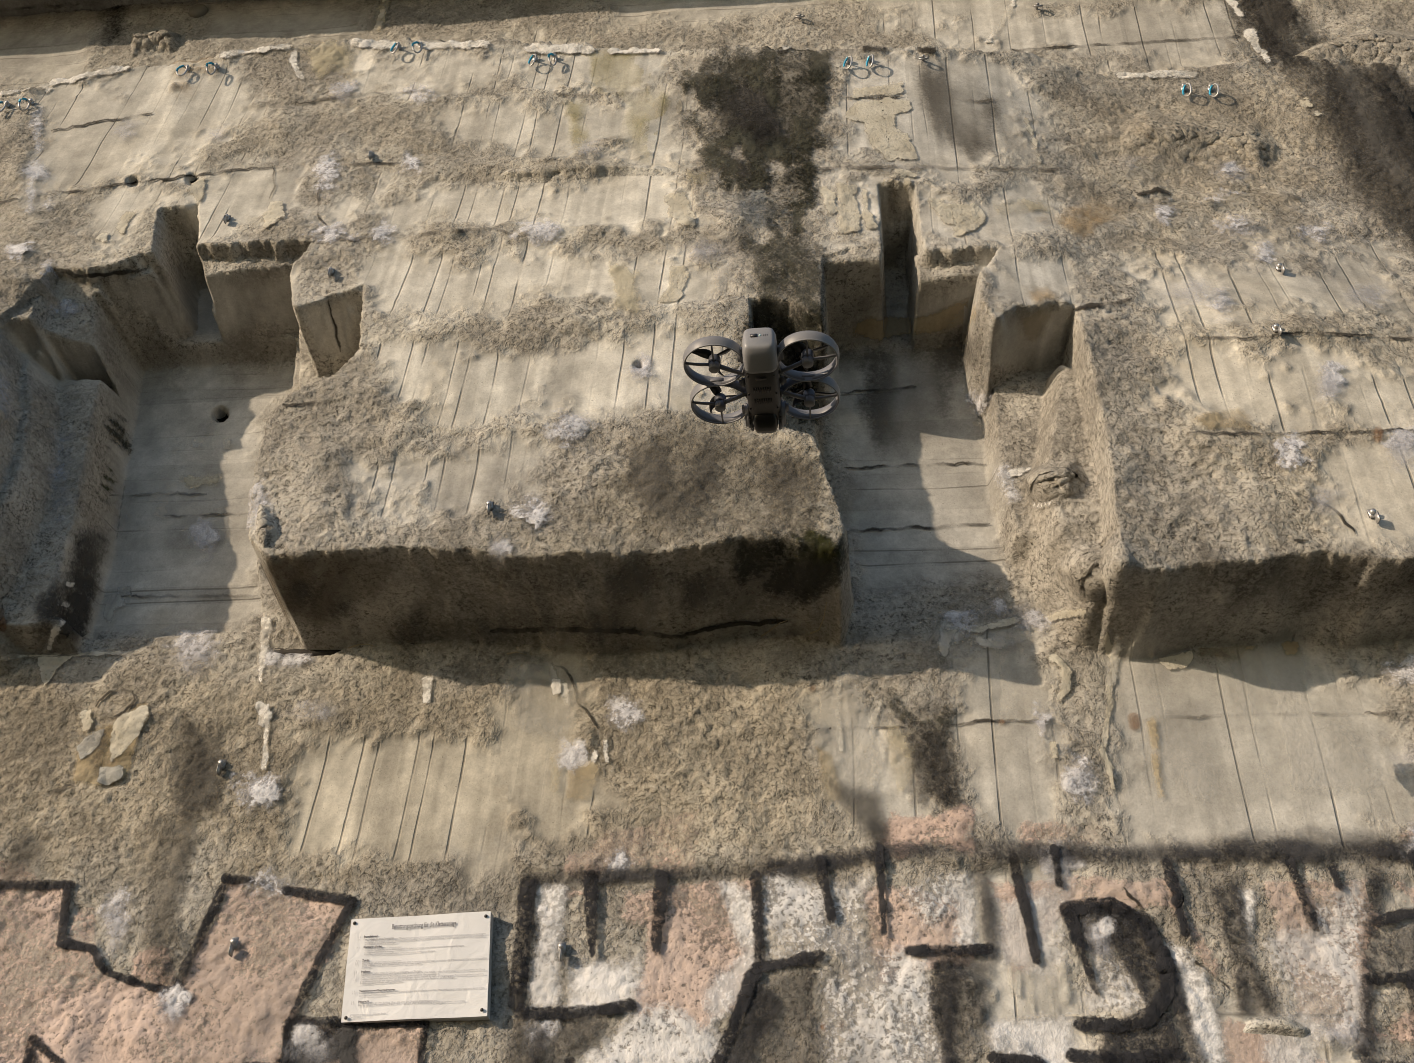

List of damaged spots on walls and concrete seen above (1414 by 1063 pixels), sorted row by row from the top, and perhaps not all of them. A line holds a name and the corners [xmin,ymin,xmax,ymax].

water stain [1225,0,1414,238]
peeling [186,177,205,201]
water stain [677,45,835,327]
peeling [263,200,285,228]
peeling [928,198,986,236]
crack [490,619,788,638]
peeling [939,608,1086,657]
crack [566,671,598,728]
peeling [1049,654,1072,701]
water stain [889,691,961,807]